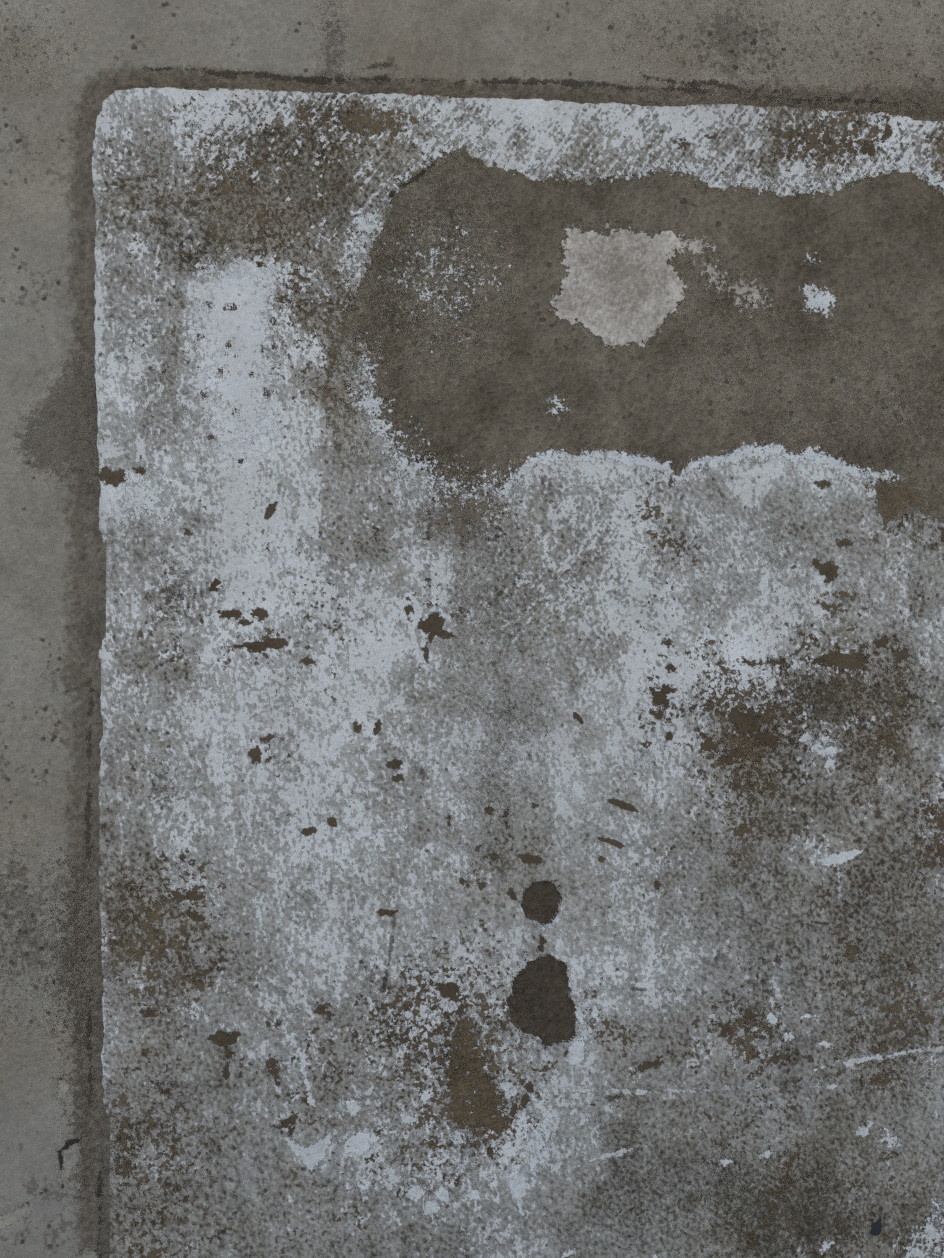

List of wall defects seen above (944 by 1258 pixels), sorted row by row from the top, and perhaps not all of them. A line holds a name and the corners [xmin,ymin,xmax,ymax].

peeling [173,248,296,469]
flaking render [335,106,944,568]
peeling [99,466,193,536]
peeling [264,501,278,519]
peeling [811,538,876,623]
peeling [404,604,466,660]
peeling [459,877,488,891]
peeling [517,852,543,865]
spalling [506,881,586,1068]
peeling [450,1130,466,1146]
peeling [405,1185,480,1216]